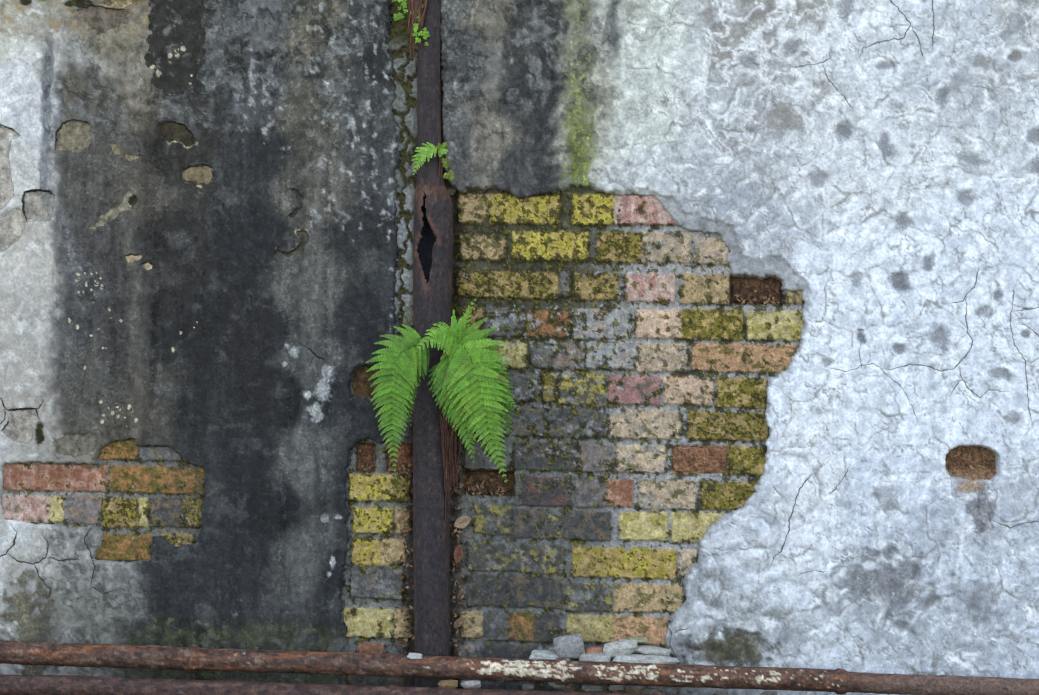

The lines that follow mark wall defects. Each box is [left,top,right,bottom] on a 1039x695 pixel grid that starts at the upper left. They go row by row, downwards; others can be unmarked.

peeling [77,0,207,96]
crack [860,0,935,59]
peeling [0,124,55,252]
crack [0,398,43,424]
crack [0,526,114,597]
flaking render [1,433,205,562]
water stain [39,0,400,648]
flaking render [342,364,415,655]
flaking render [440,39,805,664]
crack [772,476,810,562]
crack [832,268,1039,421]
hole [946,446,996,480]